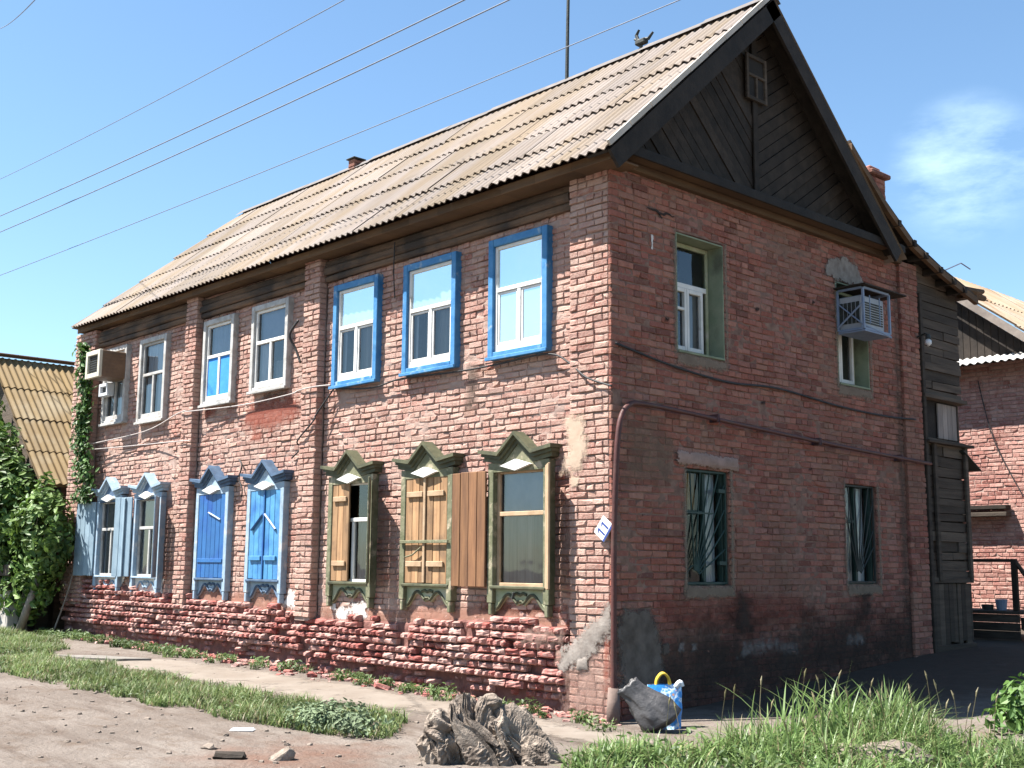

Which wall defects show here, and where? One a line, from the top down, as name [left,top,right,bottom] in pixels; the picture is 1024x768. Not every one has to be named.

spalling [59,579,588,702]
damp [660,593,914,709]